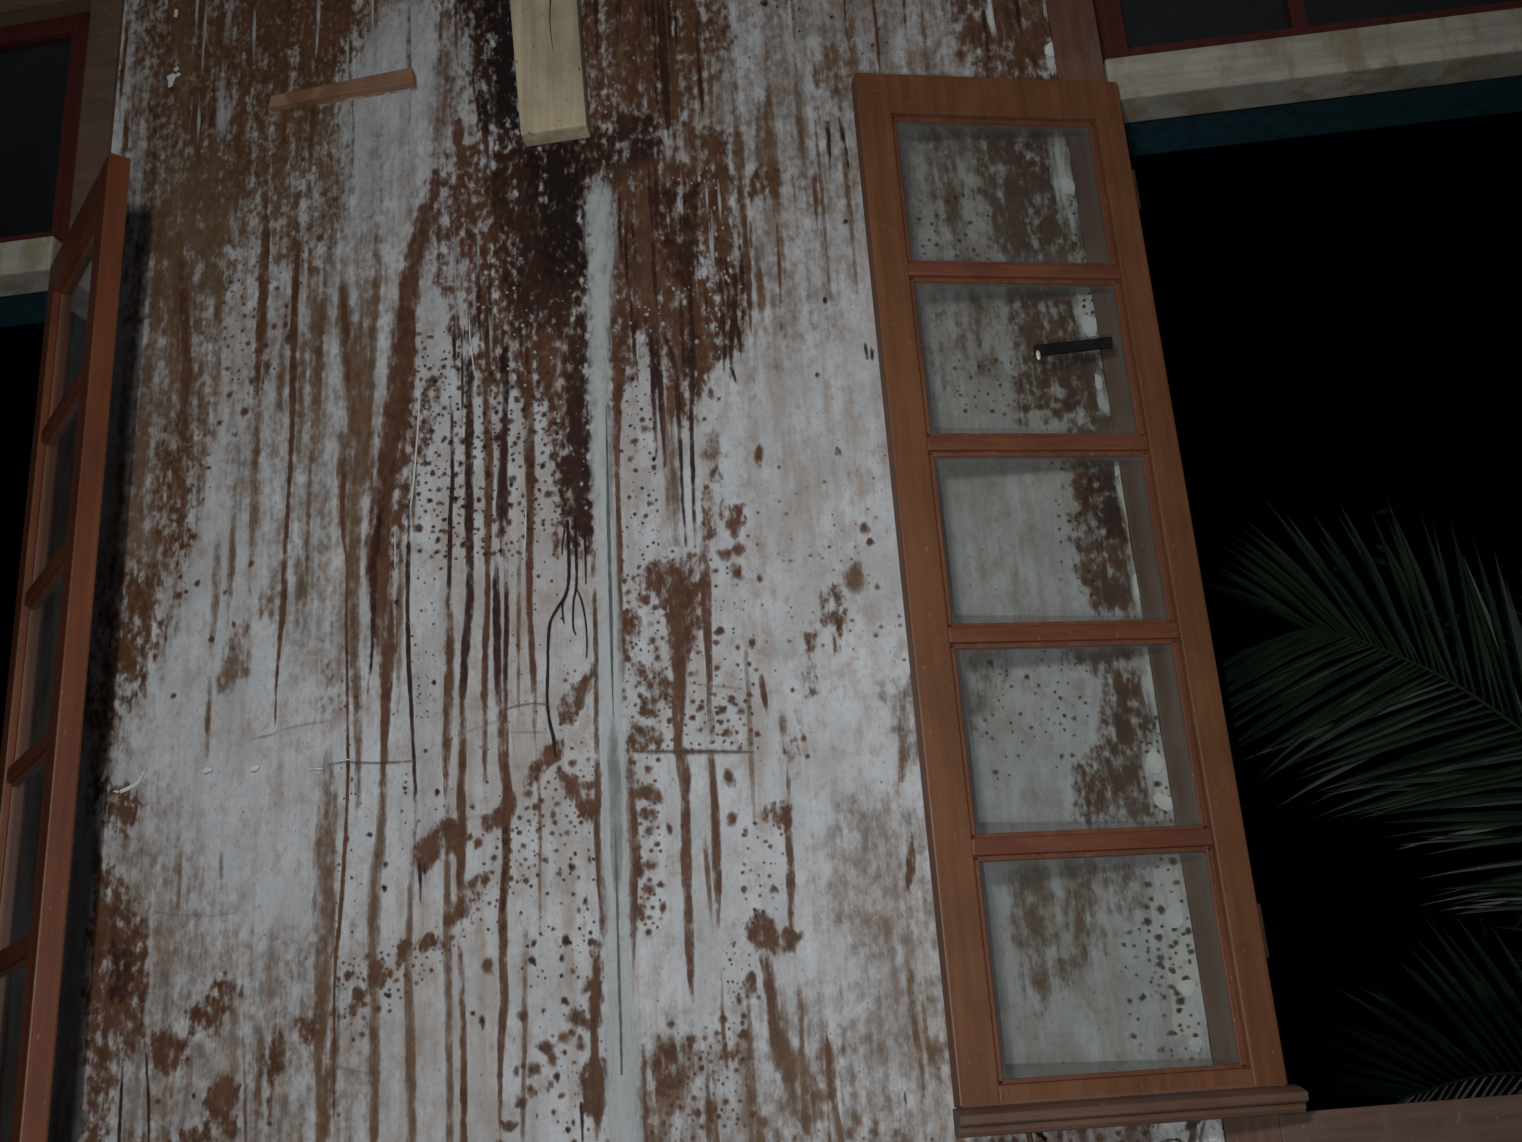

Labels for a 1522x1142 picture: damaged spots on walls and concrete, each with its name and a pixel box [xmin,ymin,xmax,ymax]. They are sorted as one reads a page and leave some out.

rust [950,0,1058,80]
rust [916,127,1087,263]
rust [936,287,1112,433]
rust [260,113,810,1142]
rust [783,508,880,697]
rust [1051,459,1140,620]
rust [893,658,918,780]
rust [963,647,1170,829]
rust [81,834,243,1142]
rust [906,822,915,889]
rust [1011,855,1161,1014]
rust [1038,1124,1160,1142]